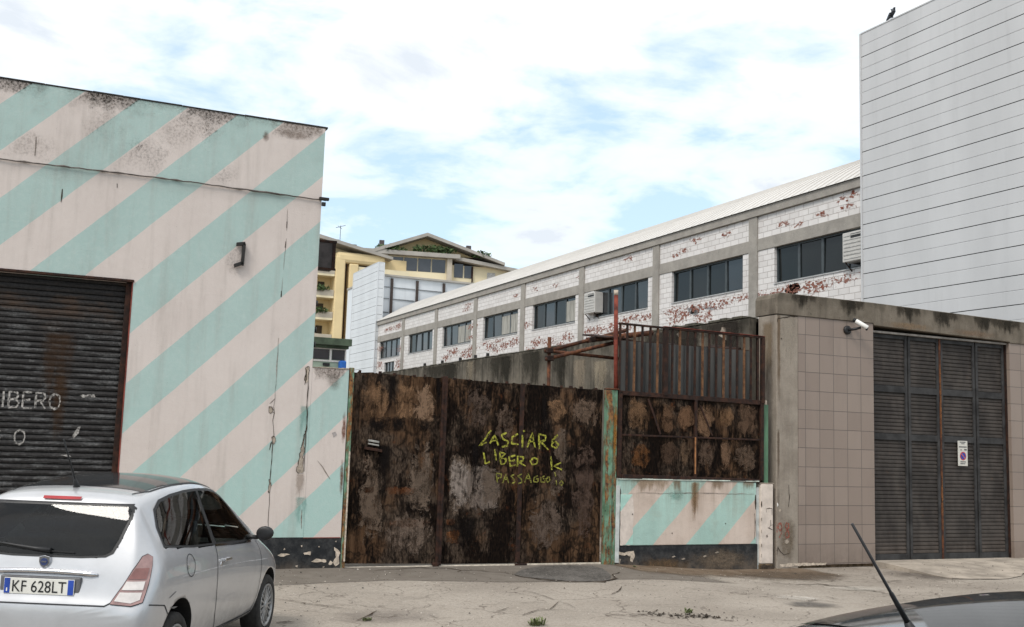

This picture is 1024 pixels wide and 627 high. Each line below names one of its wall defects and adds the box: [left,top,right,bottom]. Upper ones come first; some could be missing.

peeling [816,190,859,217]
peeling [441,272,860,362]
leakage [841,300,863,314]
leakage [898,307,920,321]
leakage [933,311,957,326]
leakage [975,317,1019,333]
crack [268,338,279,519]
spalling [296,434,305,489]
spalling [278,541,340,567]